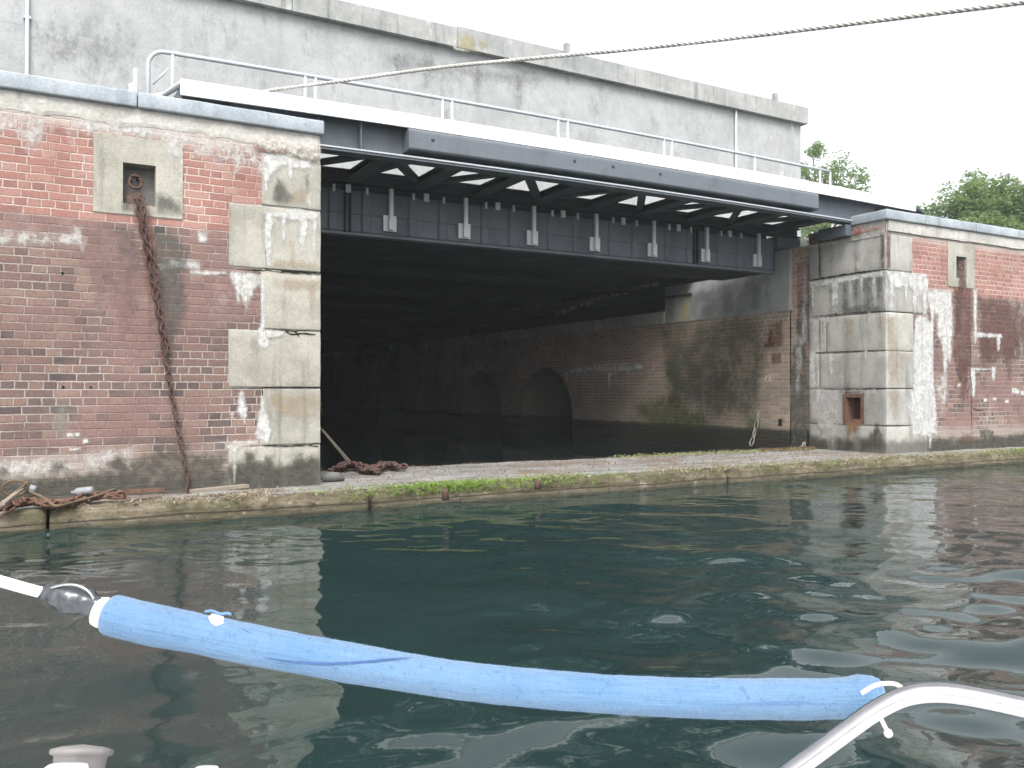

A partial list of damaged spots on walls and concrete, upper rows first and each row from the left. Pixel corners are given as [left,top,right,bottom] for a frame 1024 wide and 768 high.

water stain [79,121,317,347]
crack [266,329,316,337]
water stain [665,280,763,411]
water stain [791,267,1024,444]